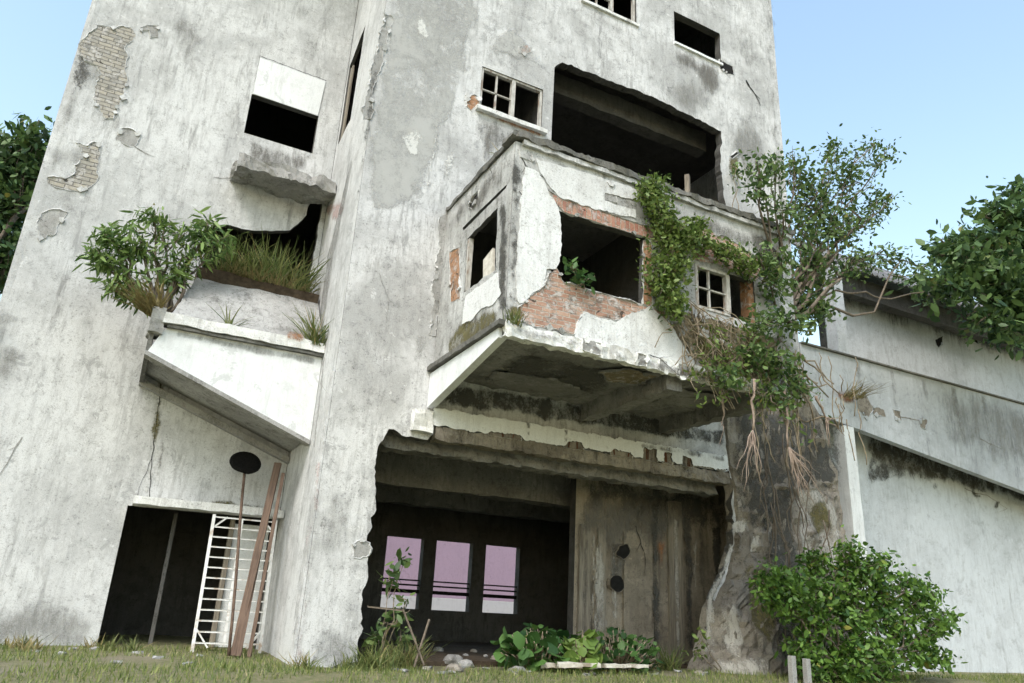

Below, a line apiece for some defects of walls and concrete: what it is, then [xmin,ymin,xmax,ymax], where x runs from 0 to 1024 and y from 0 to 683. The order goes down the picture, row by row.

spalling [78,25,160,147]
peeling [360,0,482,210]
spalling [46,141,101,192]
spalling [36,208,68,241]
peeling [428,213,461,337]
flaking render [517,180,779,386]
crack [137,385,161,497]
water stain [444,355,724,456]
spalling [610,448,694,468]
spalling [857,394,902,422]
water stain [868,438,1024,508]
spalling [352,537,373,559]